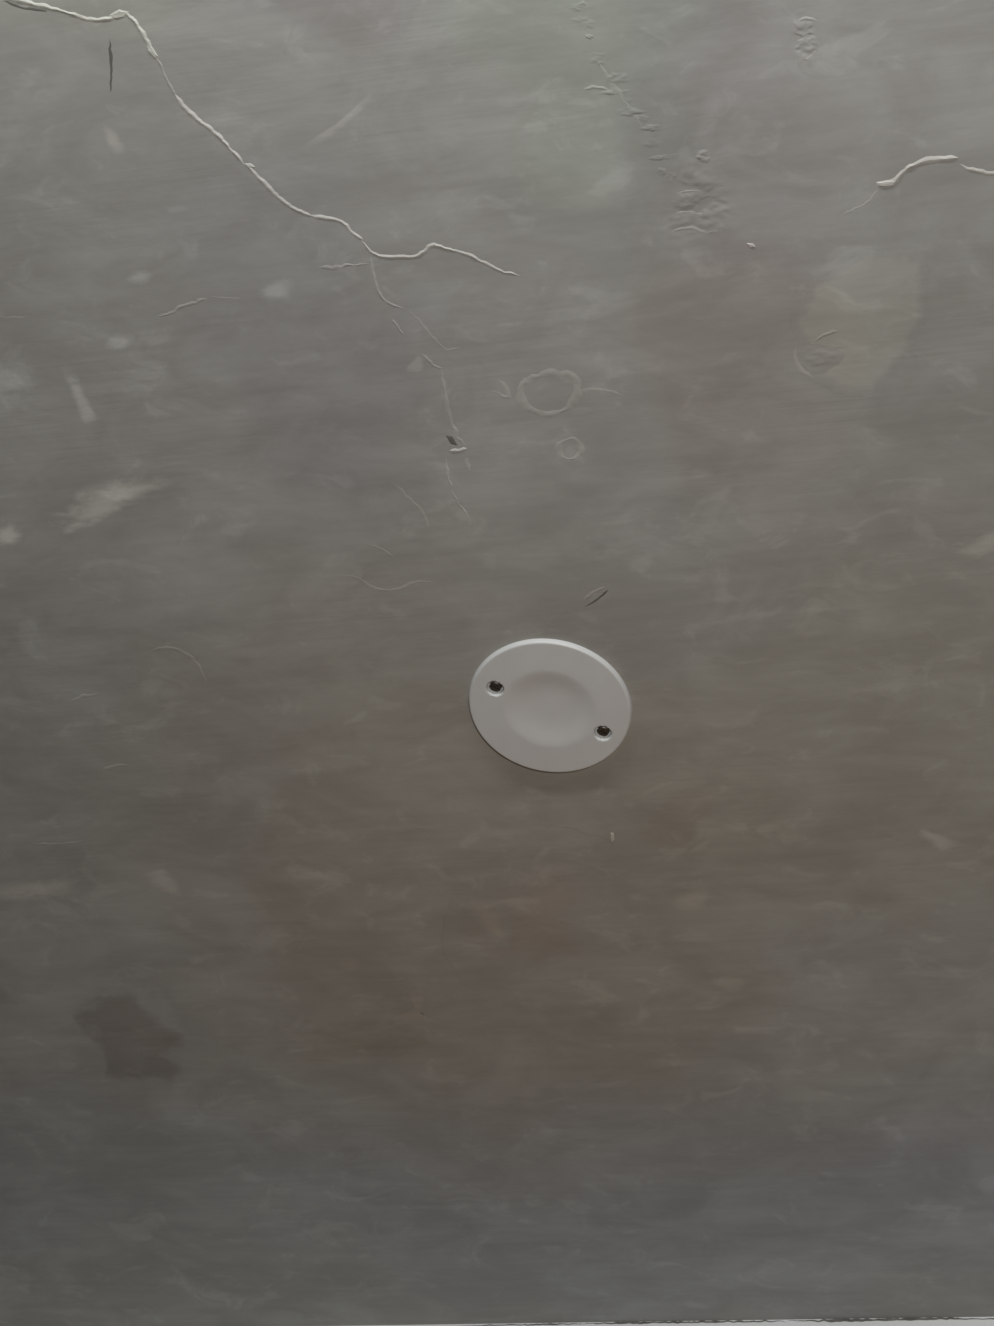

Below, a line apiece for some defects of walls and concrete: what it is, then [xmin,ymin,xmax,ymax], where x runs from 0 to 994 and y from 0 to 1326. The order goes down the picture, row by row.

crack [4,0,520,309]
crack [840,155,994,216]
crack [157,296,240,317]